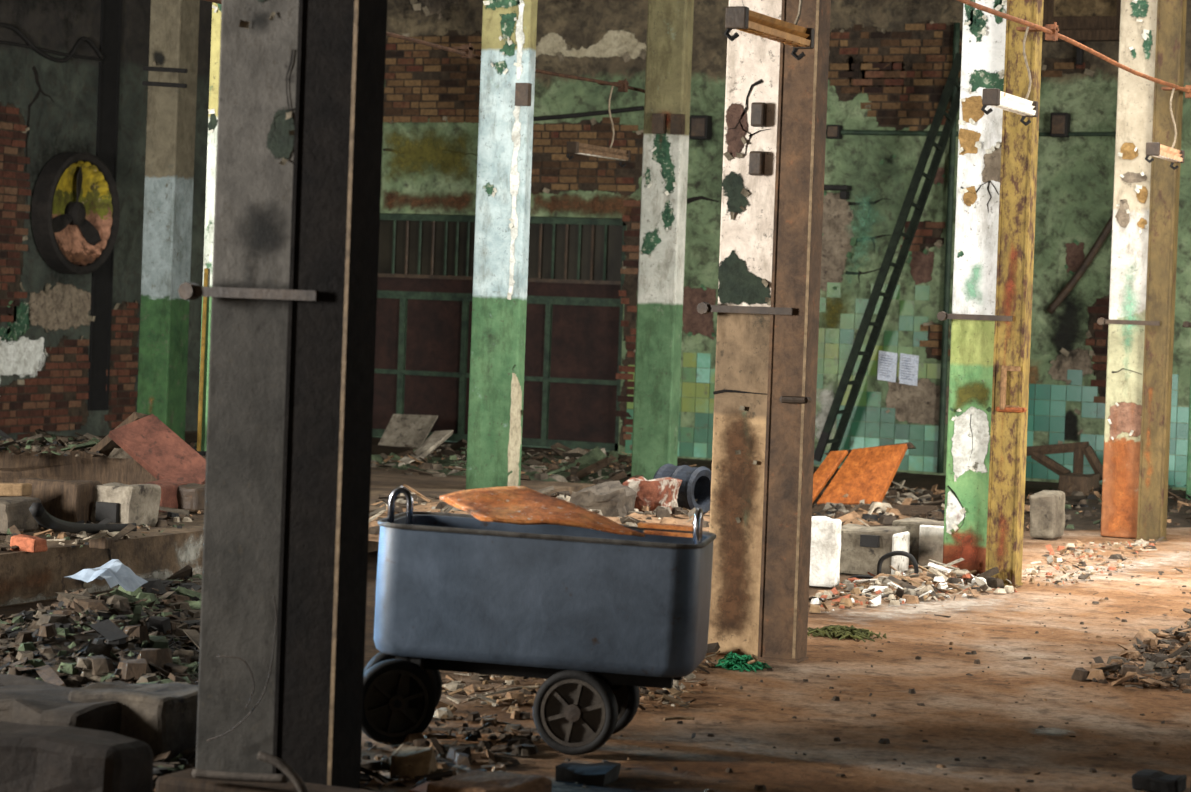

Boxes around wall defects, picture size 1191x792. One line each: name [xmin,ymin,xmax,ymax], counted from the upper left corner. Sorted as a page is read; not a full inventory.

flaking render [383,0,647,124]
spalling [722,103,751,220]
flaking render [828,0,1007,208]
spalling [1115,142,1148,234]
peeling [1129,0,1153,60]
flaking render [0,102,95,440]
flaking render [482,106,677,450]
flaking render [104,300,140,430]
peeling [885,378,991,534]